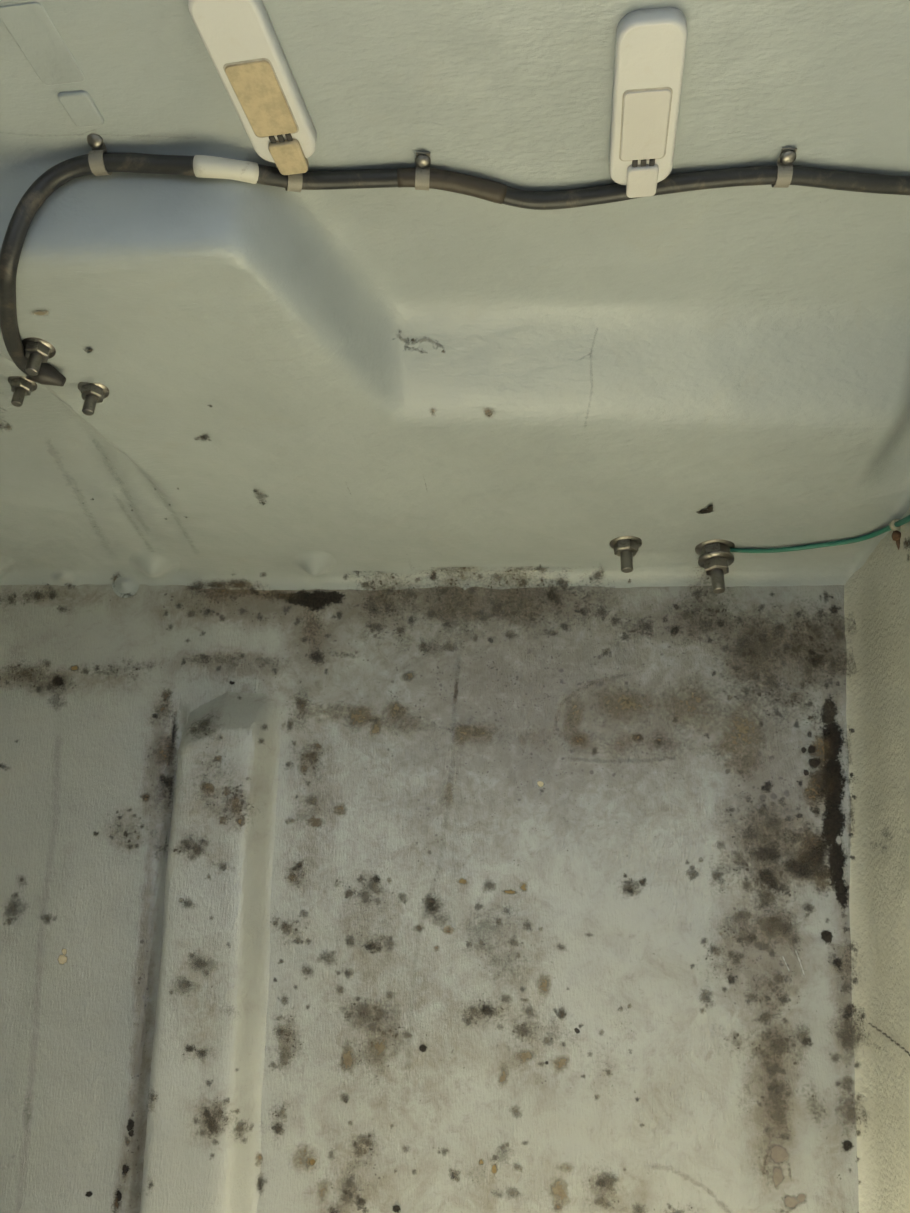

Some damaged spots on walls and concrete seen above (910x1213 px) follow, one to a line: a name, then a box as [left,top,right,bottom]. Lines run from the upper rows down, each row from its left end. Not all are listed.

water stain [165,573,349,673]
water stain [6,659,151,692]
water stain [142,690,254,826]
water stain [284,695,417,831]
water stain [335,566,871,1184]
water stain [270,986,304,1067]
water stain [302,951,427,1085]
water stain [125,1118,134,1146]
water stain [194,1097,252,1159]
water stain [256,1154,264,1191]
water stain [319,1133,373,1213]
water stain [551,1165,569,1210]